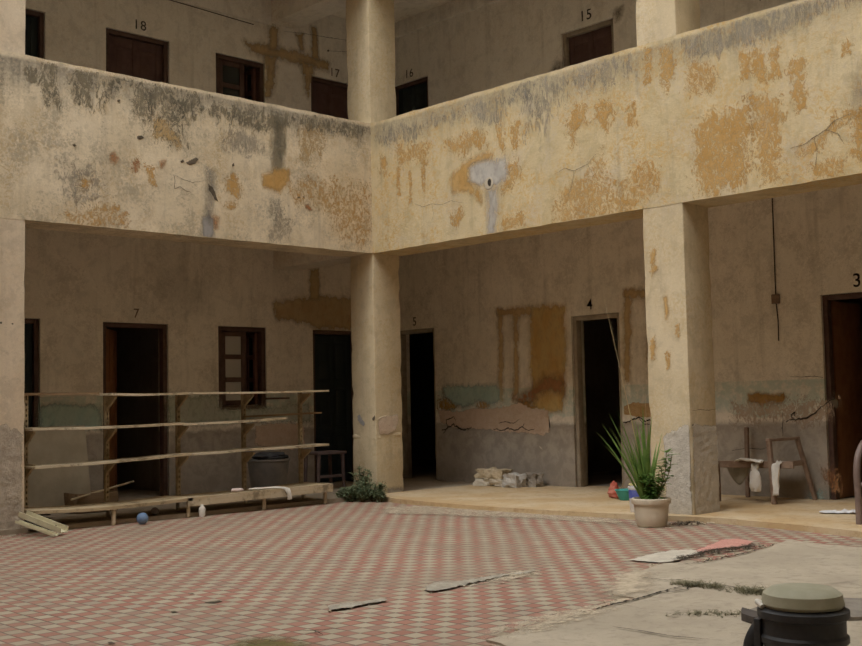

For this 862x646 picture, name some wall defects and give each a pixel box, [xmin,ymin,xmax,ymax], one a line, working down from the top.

water stain [23,26,372,250]
crack [790,114,849,165]
water stain [379,140,430,203]
water stain [442,121,529,233]
peeling [437,396,550,436]
peeling [624,402,651,417]
crack [782,399,834,431]